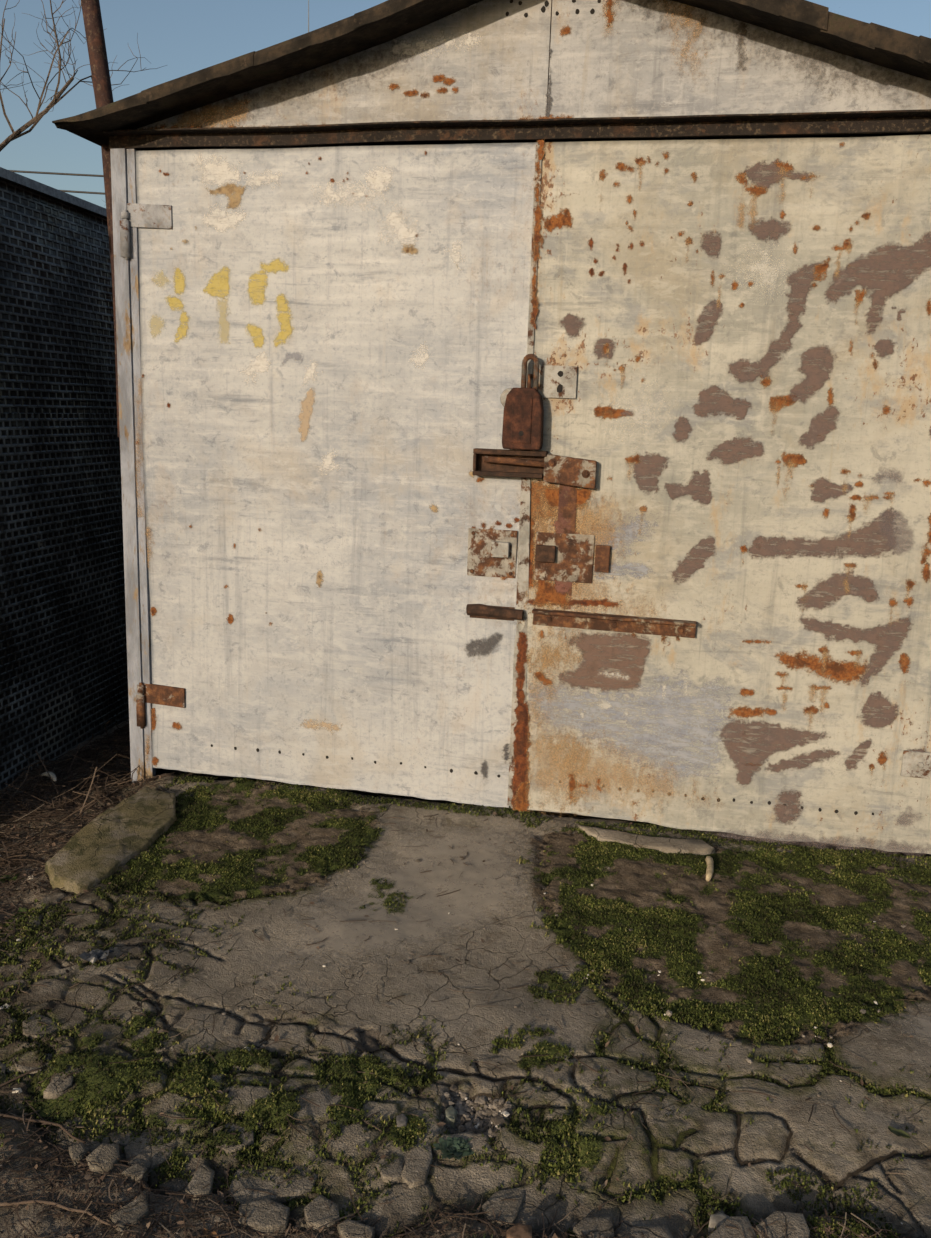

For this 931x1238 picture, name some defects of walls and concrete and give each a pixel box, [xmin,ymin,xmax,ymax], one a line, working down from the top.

rust [389,74,458,98]
rust [472,480,628,613]
rust [146,708,159,767]
rust [511,630,672,812]
rust [728,640,868,722]
rust [869,751,887,771]
rust [899,653,910,674]
crack [0,870,931,1238]